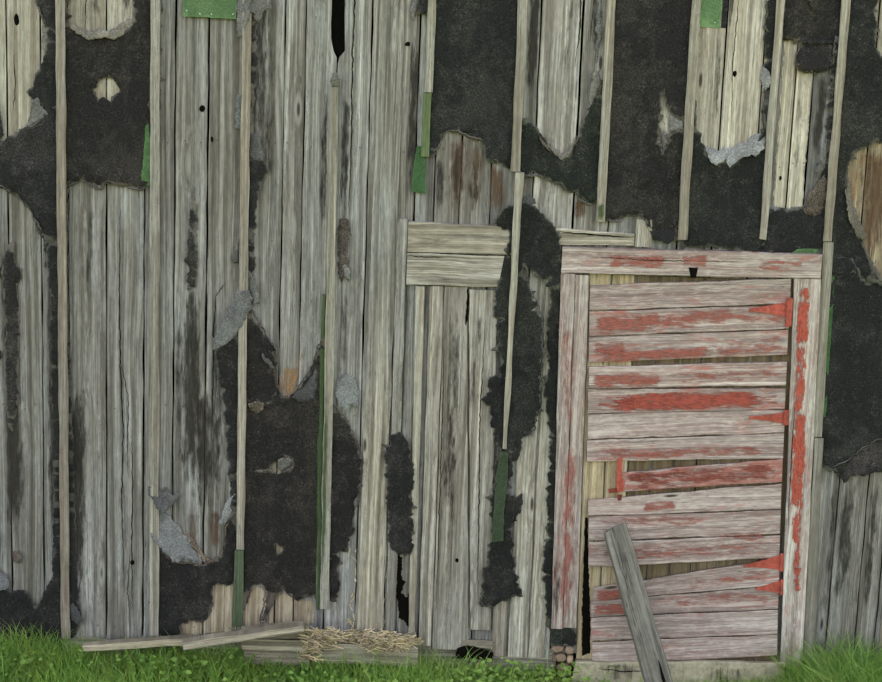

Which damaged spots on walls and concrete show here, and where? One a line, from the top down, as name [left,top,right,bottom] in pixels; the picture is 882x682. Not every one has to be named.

peeling [68,0,135,40]
peeling [874,0,882,56]
peeling [0,0,50,143]
peeling [93,78,120,101]
peeling [658,90,684,152]
peeling [696,0,833,216]
peeling [845,140,882,281]
peeling [610,255,664,268]
peeling [595,310,783,362]
peeling [595,368,779,411]
peeling [790,288,810,591]
peeling [629,465,774,491]